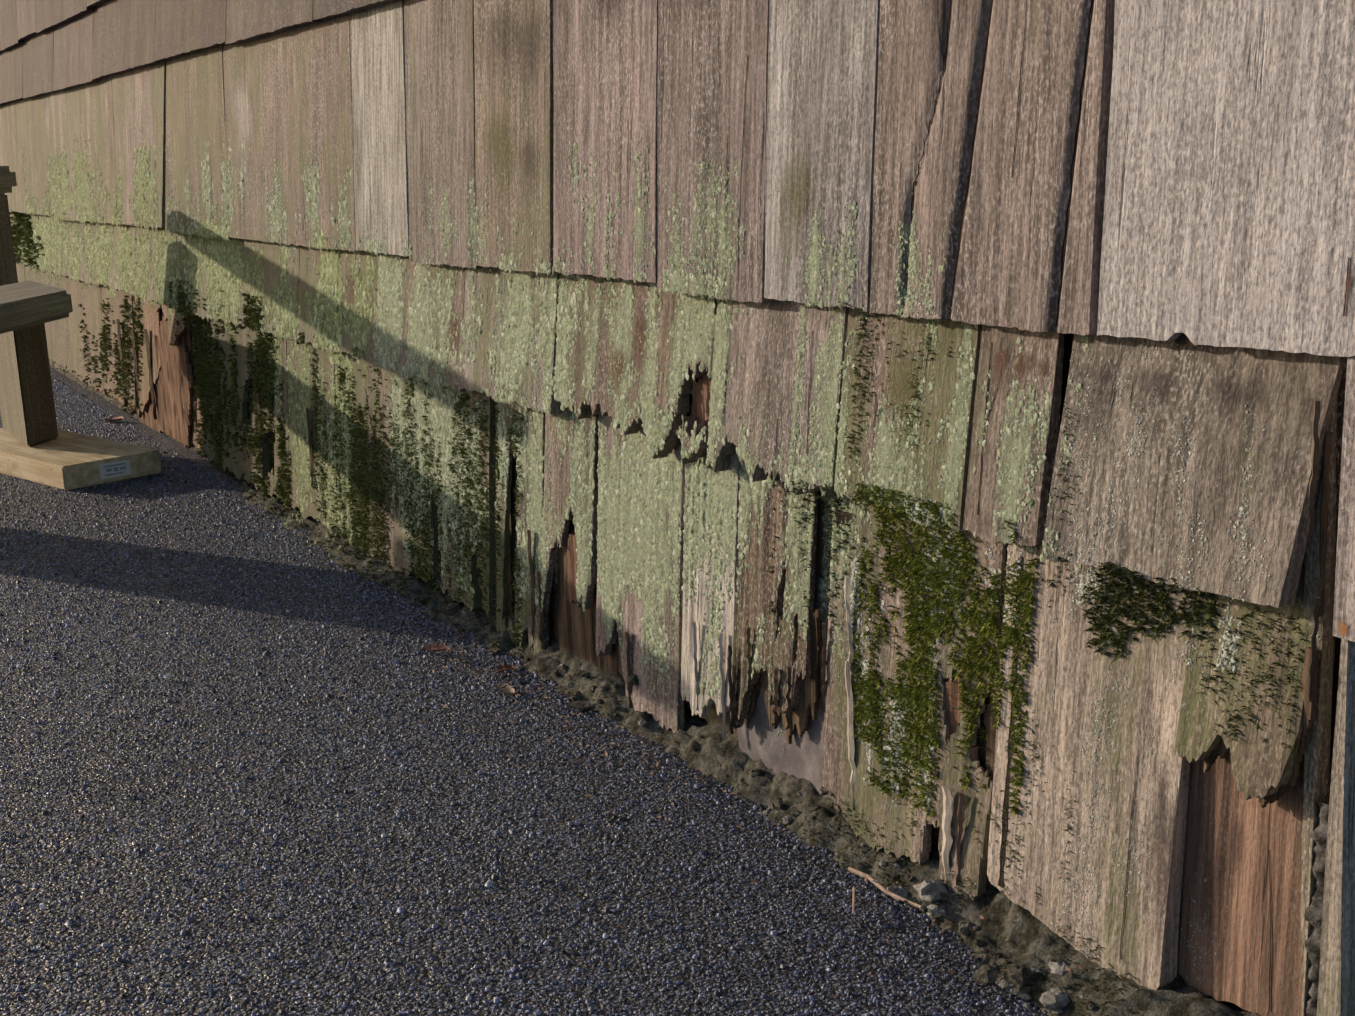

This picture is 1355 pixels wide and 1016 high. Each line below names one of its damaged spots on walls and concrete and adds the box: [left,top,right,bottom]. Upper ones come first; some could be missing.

crack [902,0,952,309]
crack [948,0,993,315]
crack [1012,0,1027,178]
crack [1055,0,1093,327]
water stain [611,322,647,389]
spalling [554,664,648,731]